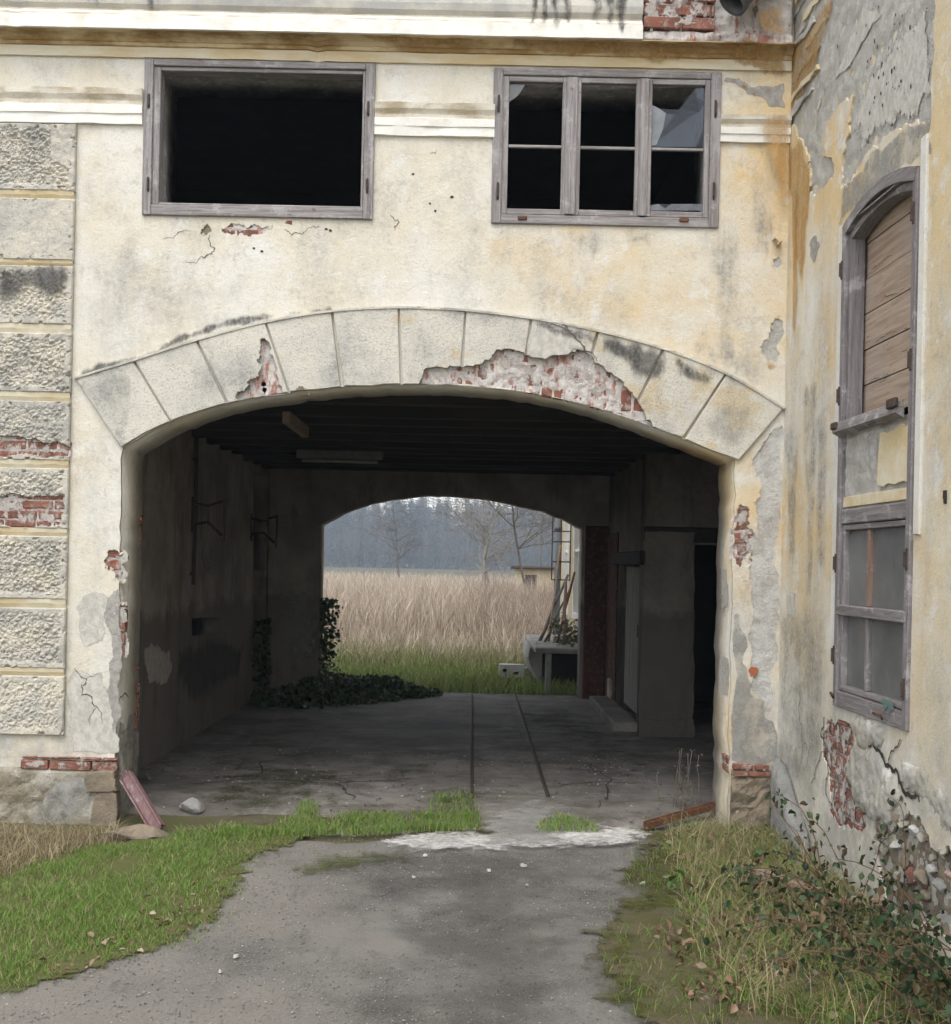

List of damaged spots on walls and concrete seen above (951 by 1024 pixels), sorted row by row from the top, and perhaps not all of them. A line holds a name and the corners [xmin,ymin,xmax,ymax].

flaking render [724,0,935,196]
flaking render [201,222,272,252]
leakage [1,267,65,295]
flaking render [236,339,283,400]
flaking render [419,349,655,430]
flaking render [0,437,72,458]
flaking render [0,494,65,528]
flaking render [721,426,796,715]
flaking render [20,515,173,826]
crack [74,668,136,724]
crack [798,693,920,819]
flaking render [823,717,951,936]